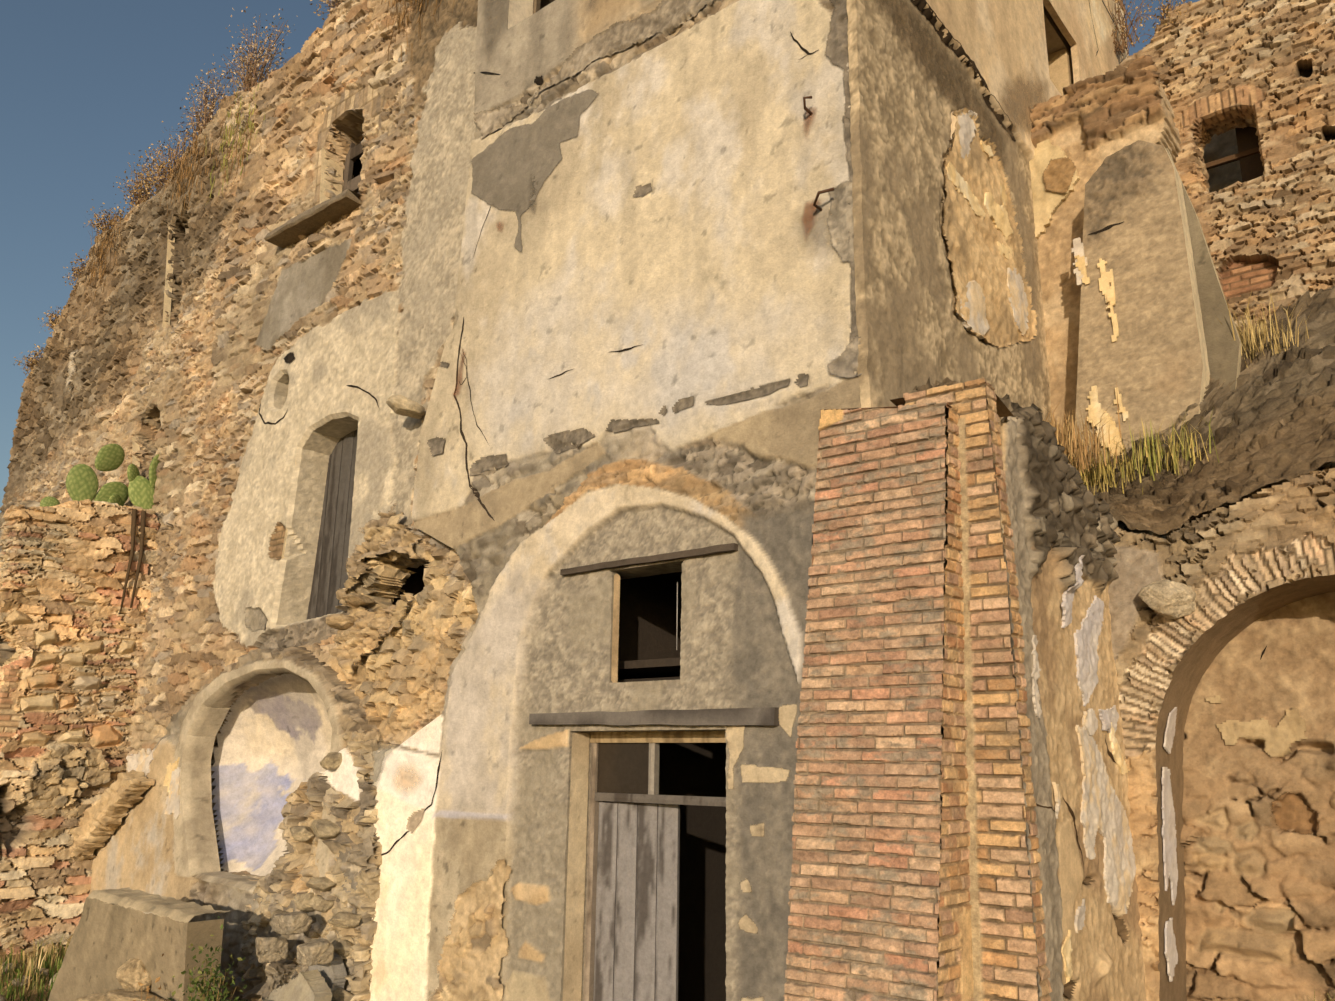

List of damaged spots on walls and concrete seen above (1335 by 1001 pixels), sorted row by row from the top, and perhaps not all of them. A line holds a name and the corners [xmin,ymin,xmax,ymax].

peeling [941,107,1080,348]
crack [453,317,495,521]
spalling [469,454,509,476]
crack [381,752,442,856]
flaking render [428,859,512,1001]